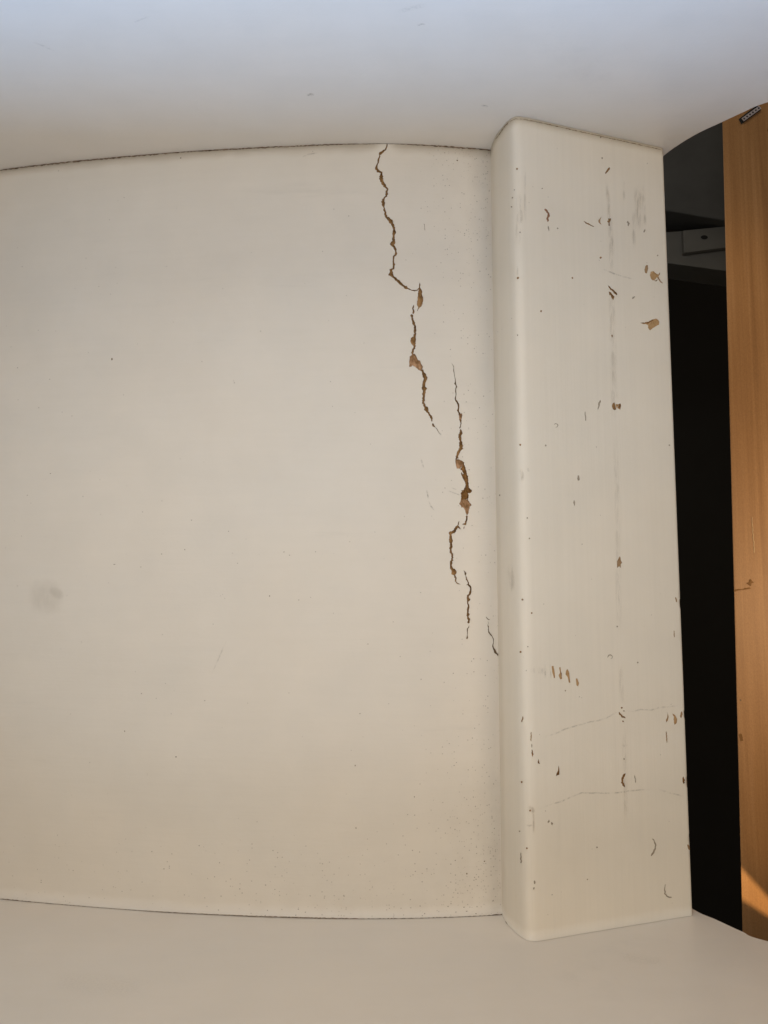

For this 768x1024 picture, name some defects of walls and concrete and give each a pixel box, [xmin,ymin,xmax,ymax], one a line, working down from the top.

crack [3,144,347,170]
crack [375,119,661,656]